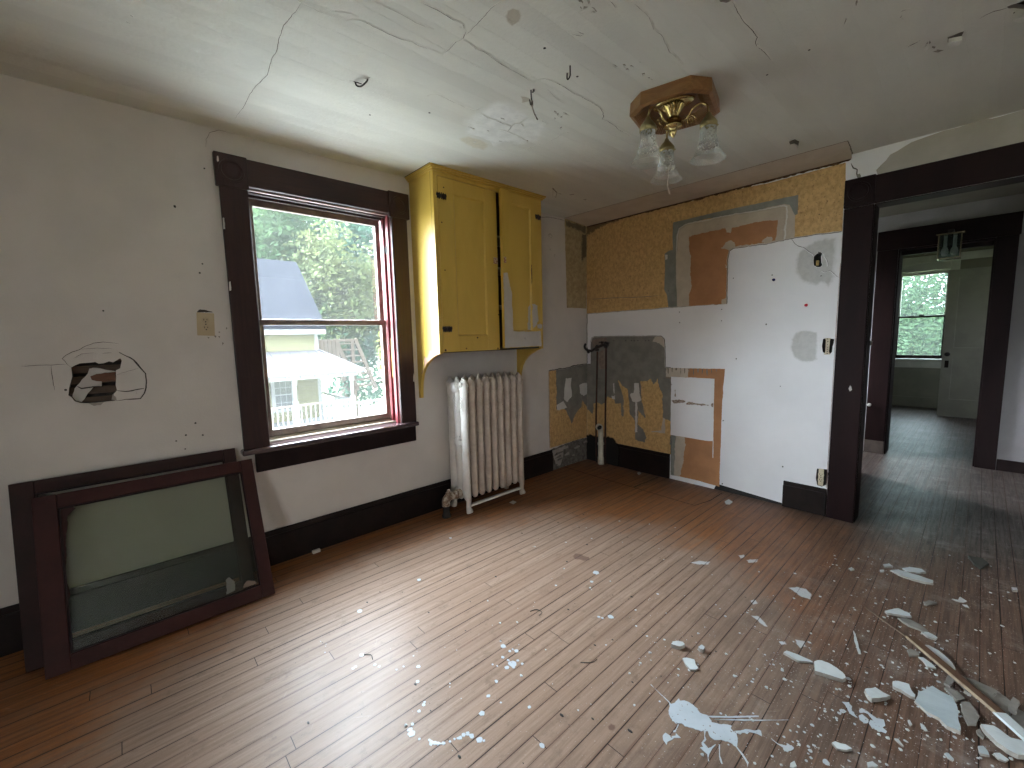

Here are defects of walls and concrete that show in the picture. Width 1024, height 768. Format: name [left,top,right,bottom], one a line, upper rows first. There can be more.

crack [206,0,632,147]
crack [733,1,773,61]
peeling [565,159,861,314]
spalling [68,351,122,406]
flaking render [549,335,725,487]